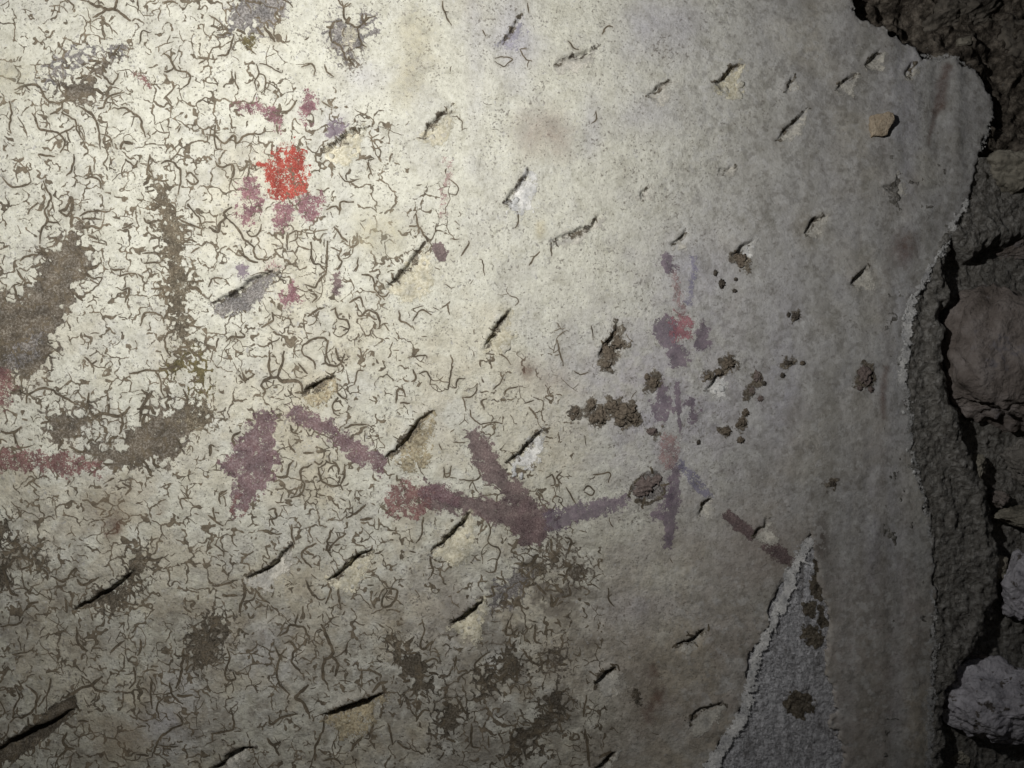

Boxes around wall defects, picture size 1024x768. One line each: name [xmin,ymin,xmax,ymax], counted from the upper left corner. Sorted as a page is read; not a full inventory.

spalling [710,59,749,100]
spalling [775,104,811,142]
crack [0,0,454,444]
crack [409,214,484,272]
spalling [803,212,830,239]
spalling [852,263,875,296]
crack [395,345,534,481]
crack [538,471,611,504]
crack [0,542,193,757]
crack [179,490,274,613]
crack [262,425,430,765]
flaking render [684,535,844,768]